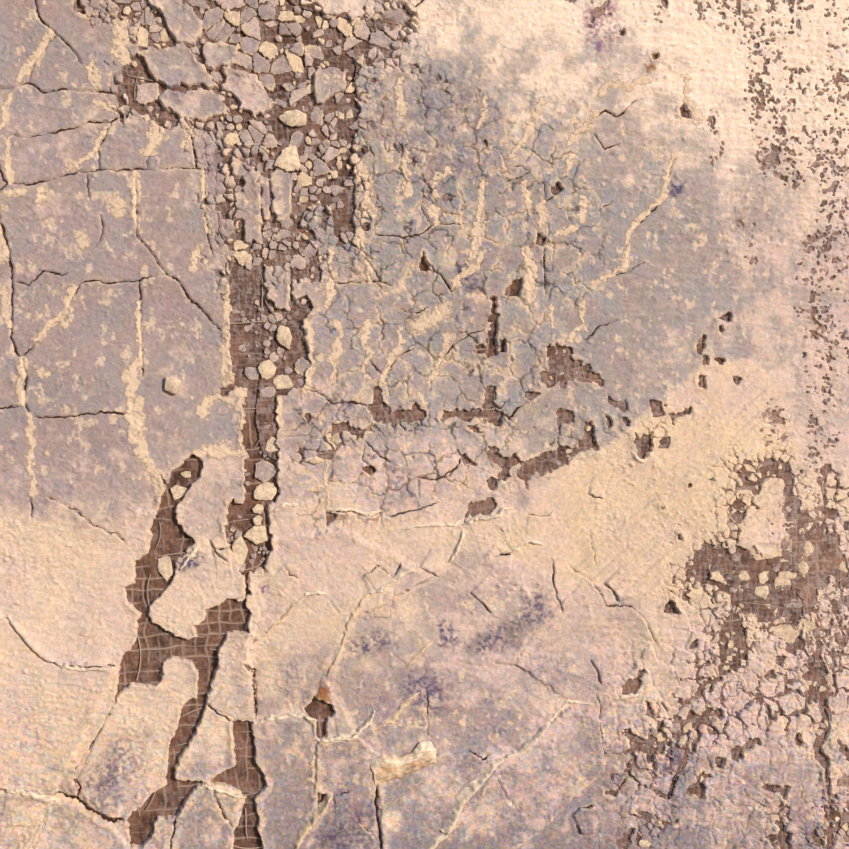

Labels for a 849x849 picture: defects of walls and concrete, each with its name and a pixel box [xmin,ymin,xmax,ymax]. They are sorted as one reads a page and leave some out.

crack [0,0,206,248]
crack [0,191,222,419]
spalling [101,0,450,849]
peeling [440,385,502,433]
spalling [475,279,521,358]
peeling [464,408,597,523]
peeling [539,344,603,389]
peeling [615,0,849,849]
crack [552,542,659,645]
crack [244,664,258,719]
crack [55,708,125,823]
crack [339,787,383,848]